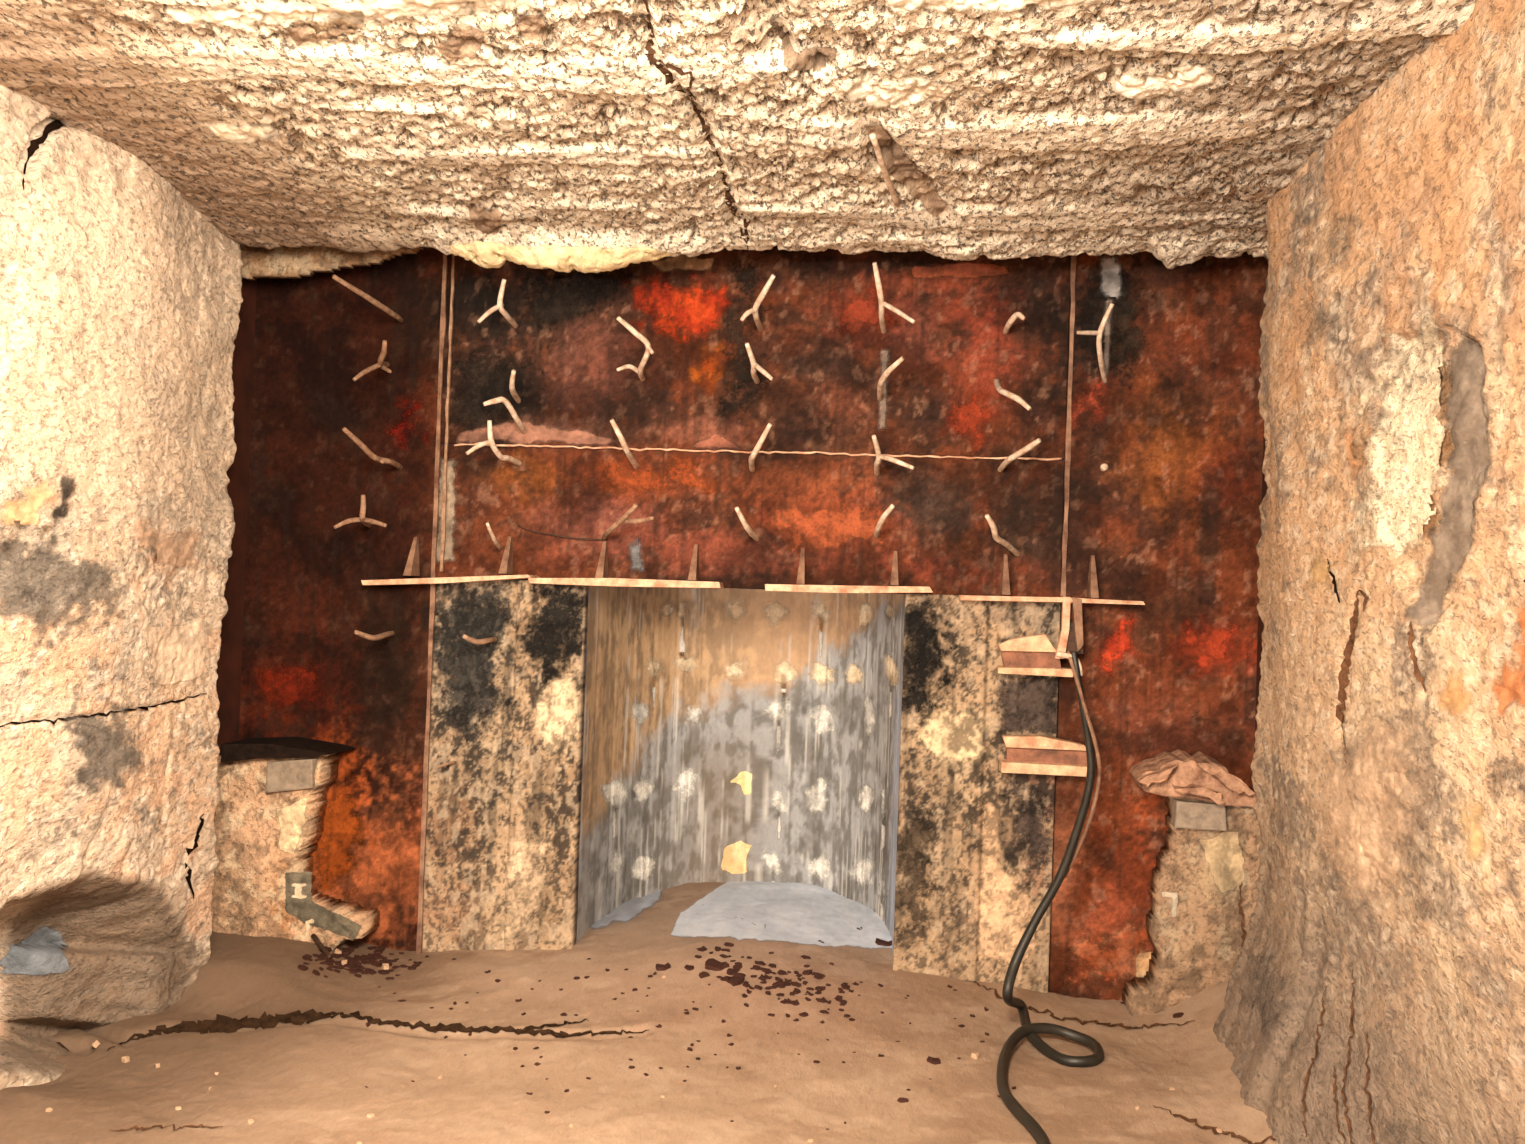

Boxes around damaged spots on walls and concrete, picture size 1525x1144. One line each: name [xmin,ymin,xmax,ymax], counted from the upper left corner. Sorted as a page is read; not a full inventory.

crack [22,120,66,189]
crack [643,0,750,250]
corrosion [633,273,732,390]
corrosion [827,286,896,335]
spalling [1346,311,1445,564]
corrosion [762,495,890,551]
mould [433,580,584,745]
damp [889,600,958,725]
damp [996,677,1057,735]
crack [1327,559,1369,768]
corrosion [1064,921,1149,985]
crack [107,1009,647,1051]